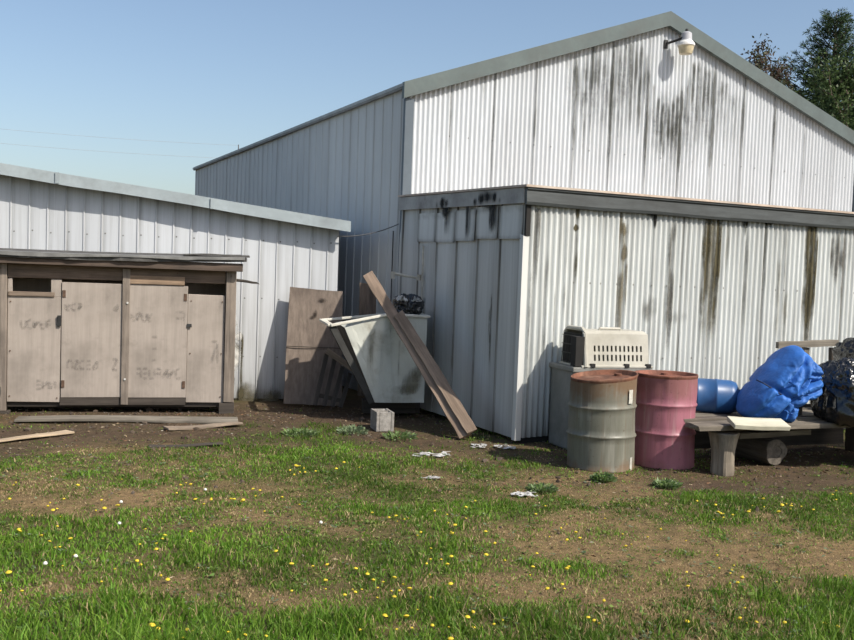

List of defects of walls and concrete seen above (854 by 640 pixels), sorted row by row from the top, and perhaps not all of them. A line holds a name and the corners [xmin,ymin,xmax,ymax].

damp [609,53,619,135]
damp [626,46,715,165]
damp [618,217,627,325]
damp [700,220,723,325]
damp [804,227,818,339]